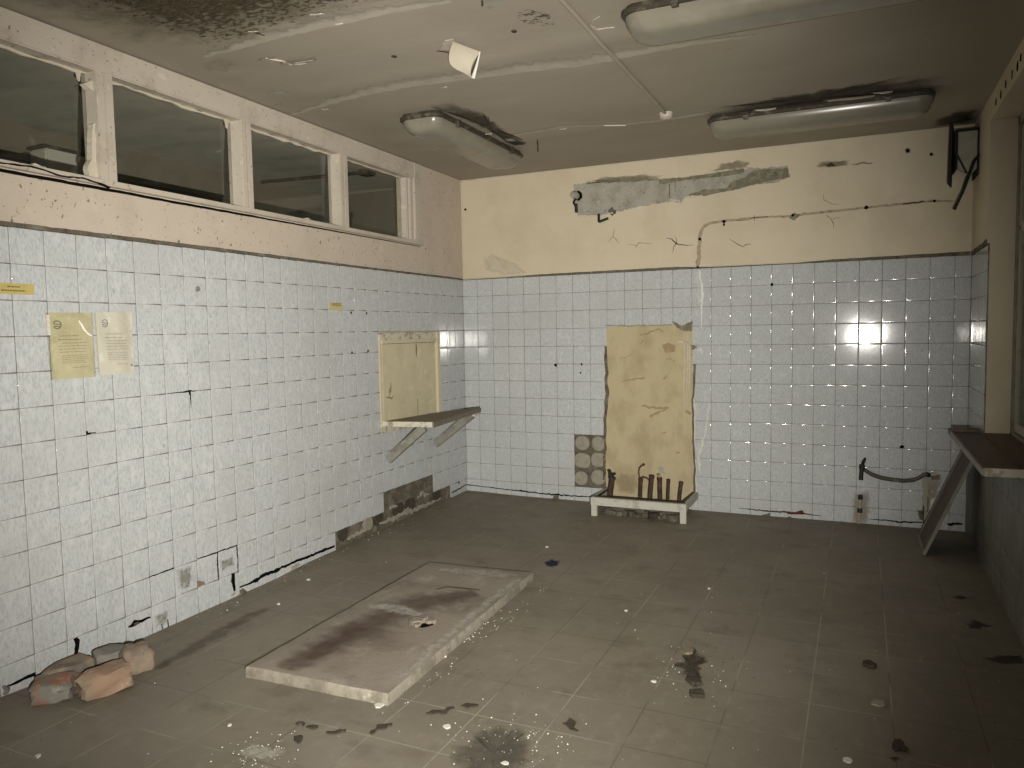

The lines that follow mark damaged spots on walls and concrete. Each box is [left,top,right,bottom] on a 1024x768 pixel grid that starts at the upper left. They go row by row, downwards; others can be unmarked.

mould [83,0,453,58]
peeling [573,161,790,217]
crack [167,390,197,404]
peeling [335,475,450,549]
crack [741,508,820,518]
crack [198,545,335,596]
crack [72,637,80,655]
crack [7,672,42,686]